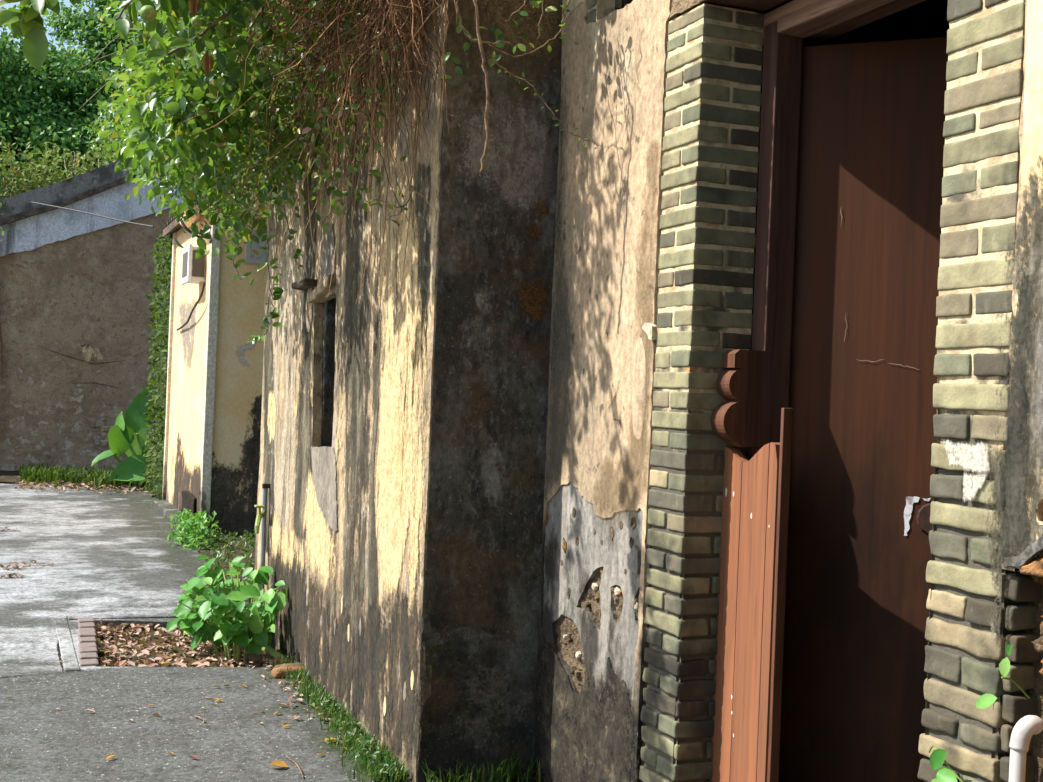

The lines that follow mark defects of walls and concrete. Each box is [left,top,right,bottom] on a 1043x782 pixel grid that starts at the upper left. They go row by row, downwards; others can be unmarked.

damp [173,103,639,782]
peeling [542,482,643,705]
damp [598,147,658,517]
damp [986,154,1043,645]
spalling [999,537,1043,782]